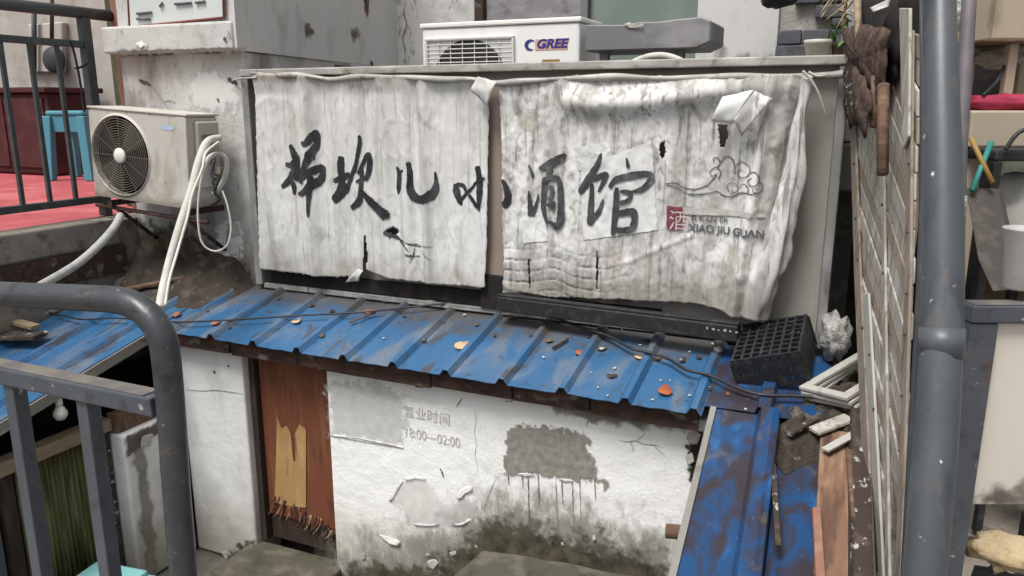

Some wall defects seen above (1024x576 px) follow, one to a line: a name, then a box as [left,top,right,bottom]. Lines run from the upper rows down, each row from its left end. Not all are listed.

damp [133,447,158,575]
peeling [379,535,400,546]
damp [335,491,675,576]